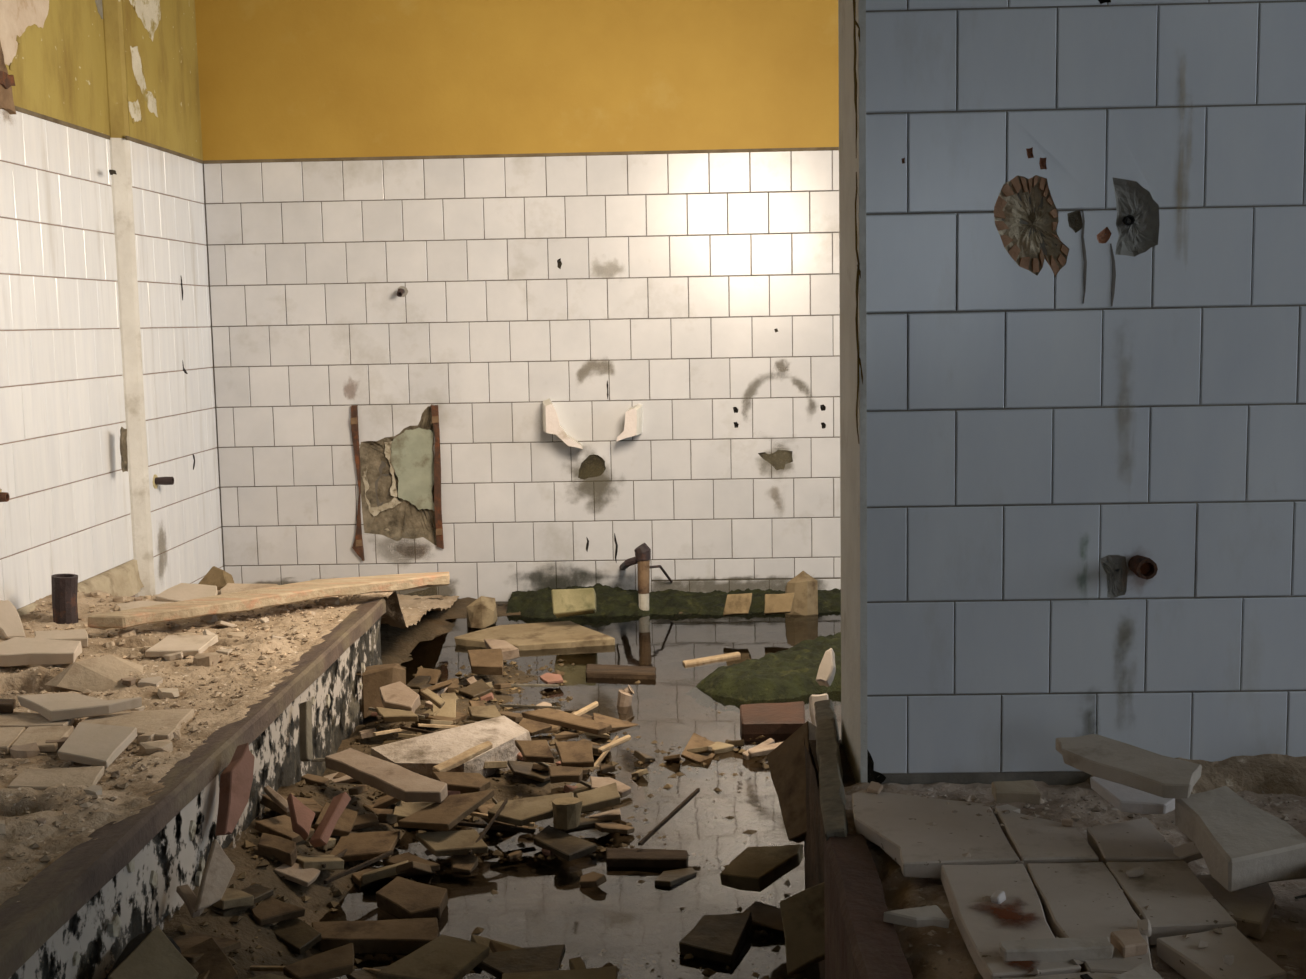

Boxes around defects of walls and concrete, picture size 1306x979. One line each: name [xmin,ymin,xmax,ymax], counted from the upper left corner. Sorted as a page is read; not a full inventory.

peeling [0,0,49,71]
peeling [127,0,161,124]
spalling [993,147,1082,277]
spalling [1097,178,1159,257]
spalling [359,406,437,545]